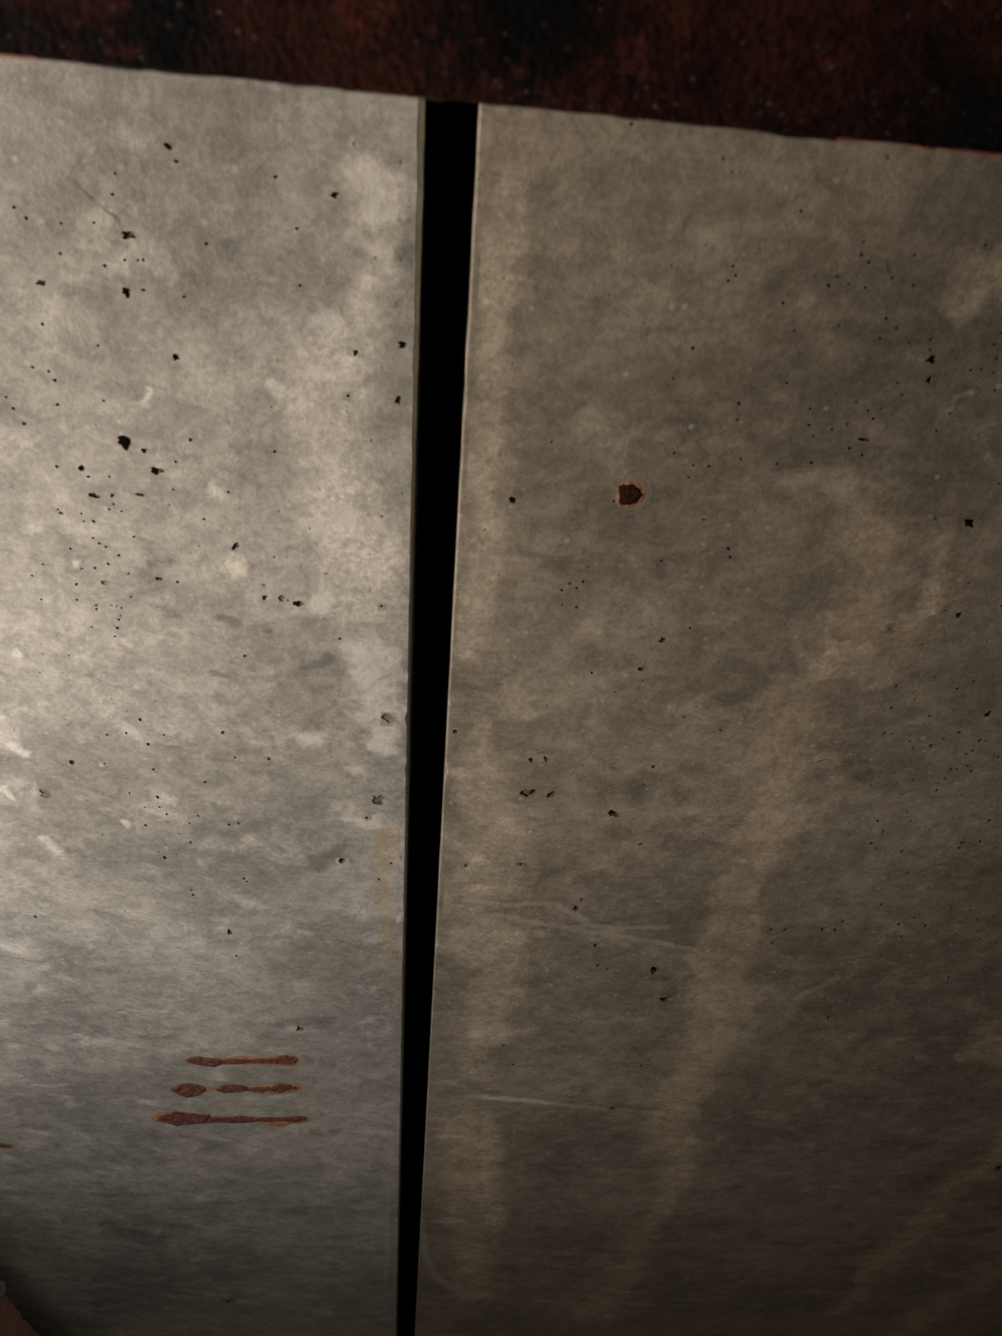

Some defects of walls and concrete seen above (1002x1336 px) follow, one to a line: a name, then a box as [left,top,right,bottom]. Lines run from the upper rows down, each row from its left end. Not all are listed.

corrosion [606,475,655,514]
corrosion [144,1051,324,1130]